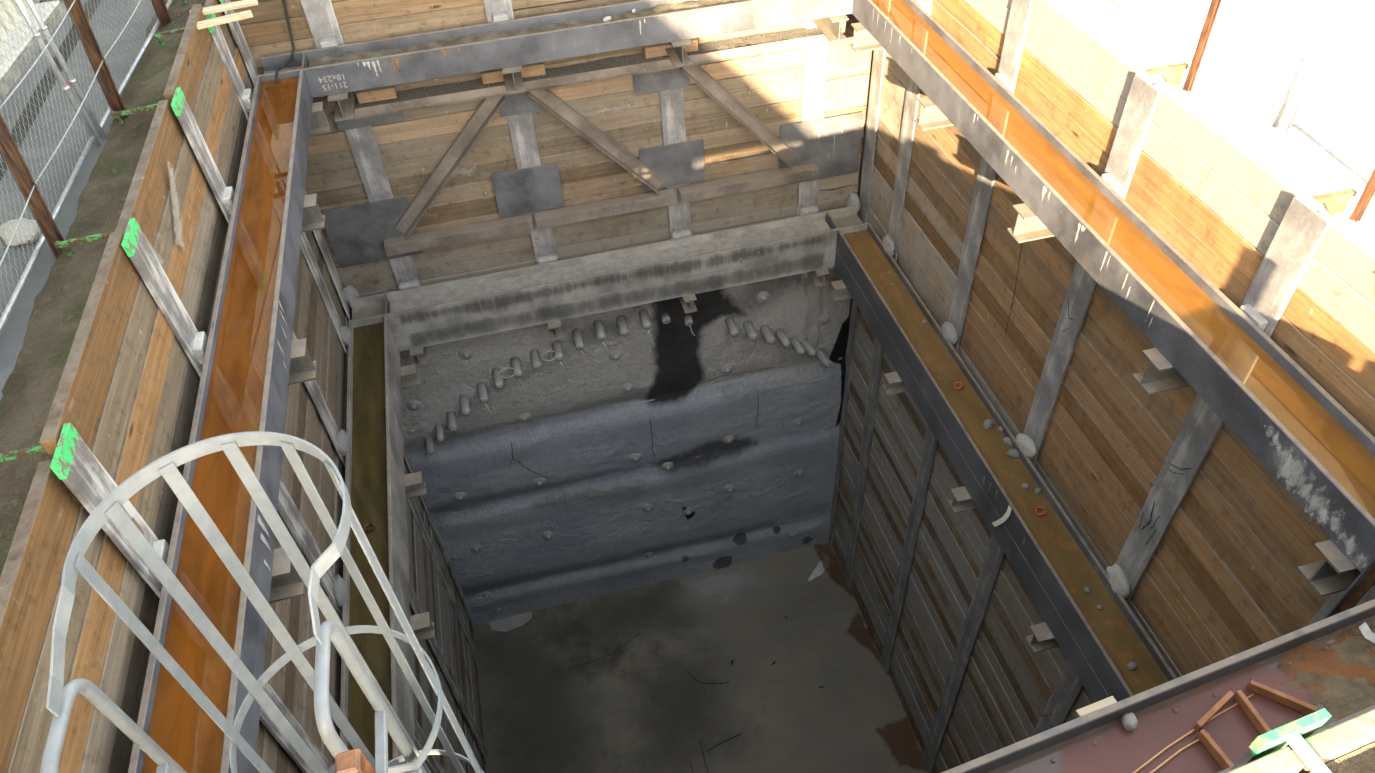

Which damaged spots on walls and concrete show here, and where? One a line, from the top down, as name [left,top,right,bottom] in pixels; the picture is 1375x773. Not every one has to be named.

damp [647,289,741,403]
damp [657,439,756,472]
rust [1066,633,1375,773]